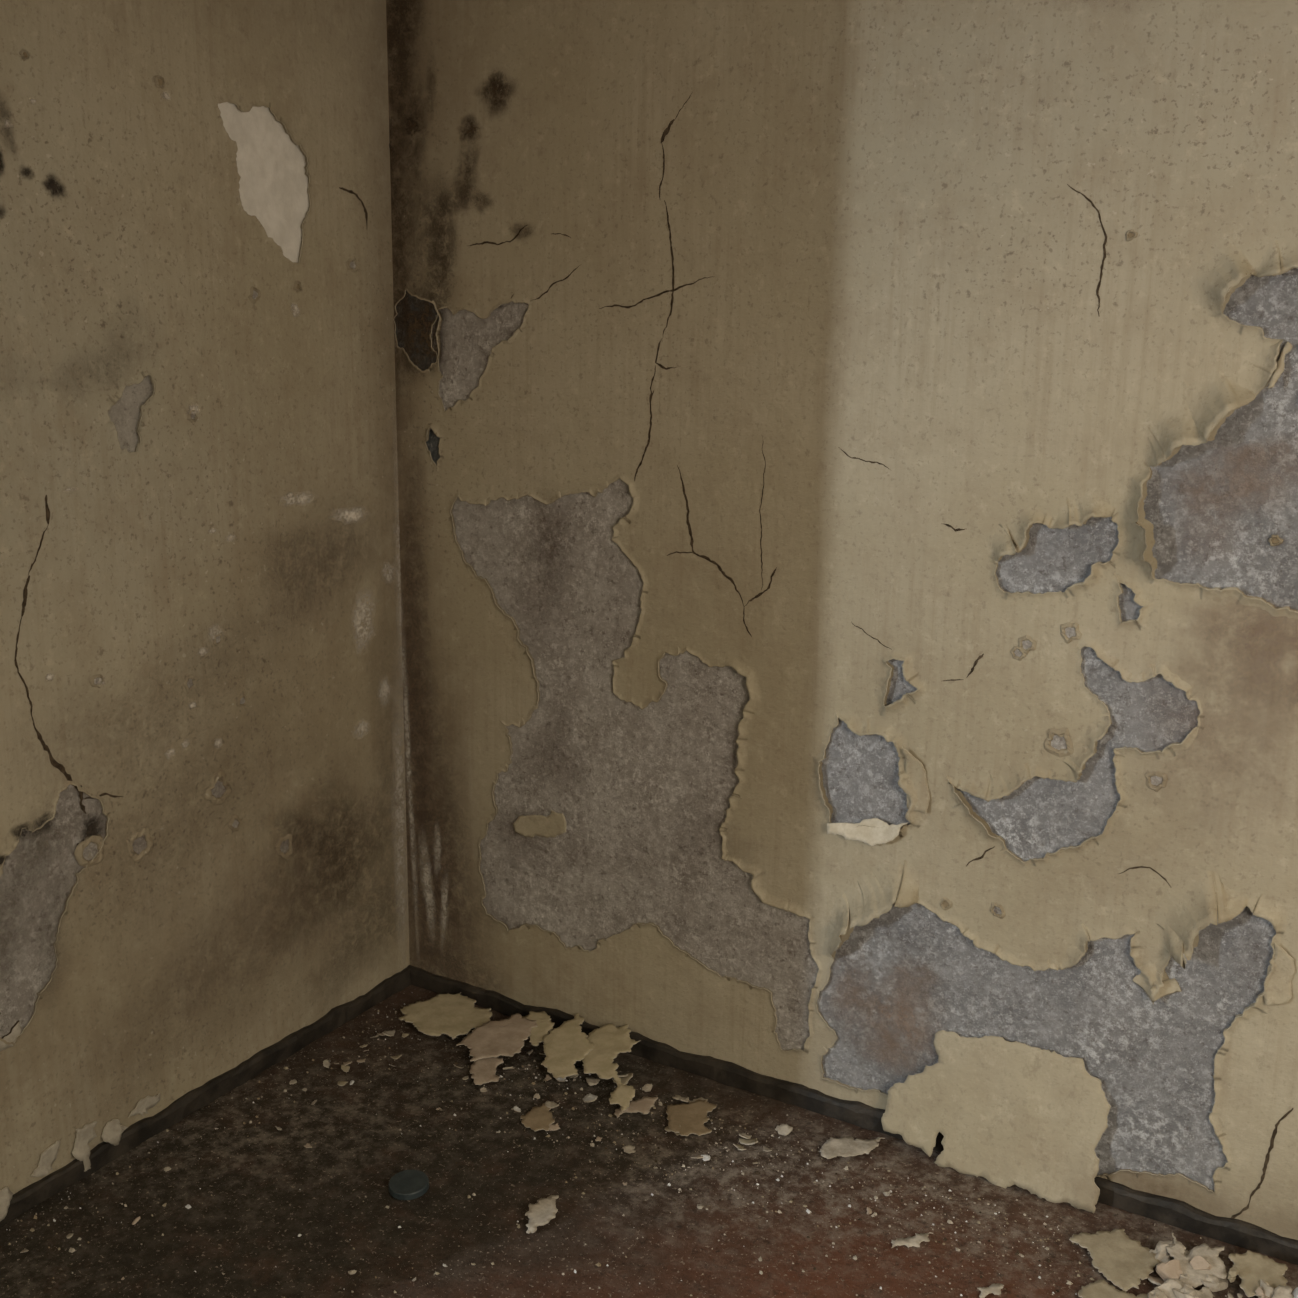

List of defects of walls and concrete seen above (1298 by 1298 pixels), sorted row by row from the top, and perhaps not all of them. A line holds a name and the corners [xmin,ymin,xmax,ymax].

damp [45,176,64,196]
peeling [214,97,313,268]
damp [388,0,440,370]
crack [599,93,709,481]
crack [14,495,123,814]
damp [336,509,362,522]
crack [667,437,777,637]
peeling [987,240,1298,632]
peeling [0,779,113,1051]
damp [397,699,457,925]
peeling [447,472,1295,1214]
peeling [1069,1229,1160,1298]